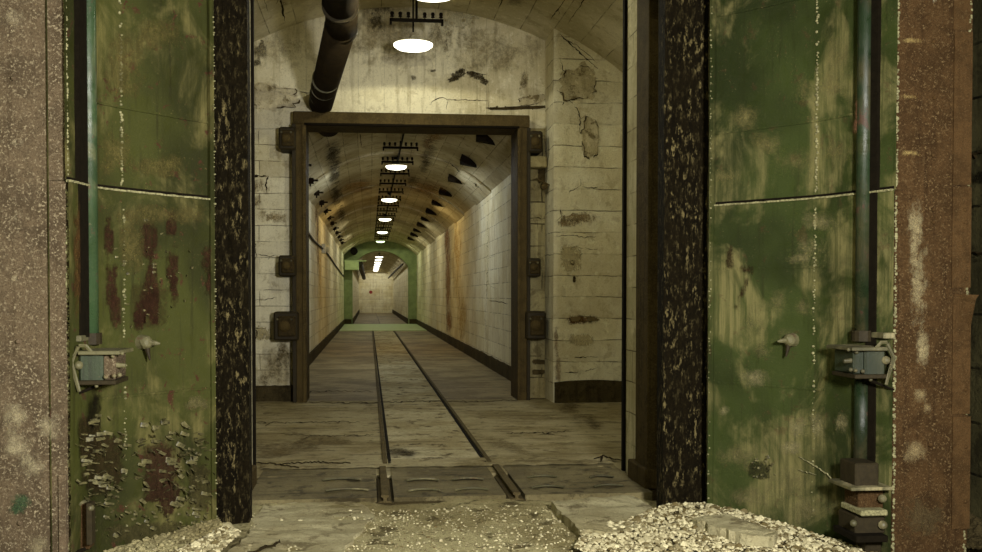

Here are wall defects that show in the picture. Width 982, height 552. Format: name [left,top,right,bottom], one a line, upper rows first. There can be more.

spalling [254,82,300,112]
spalling [449,69,488,85]
crack [550,0,598,134]
spalling [558,61,597,104]
spalling [581,116,600,160]
rust [106,267,121,325]
peeling [63,0,218,552]
rust [134,212,179,330]